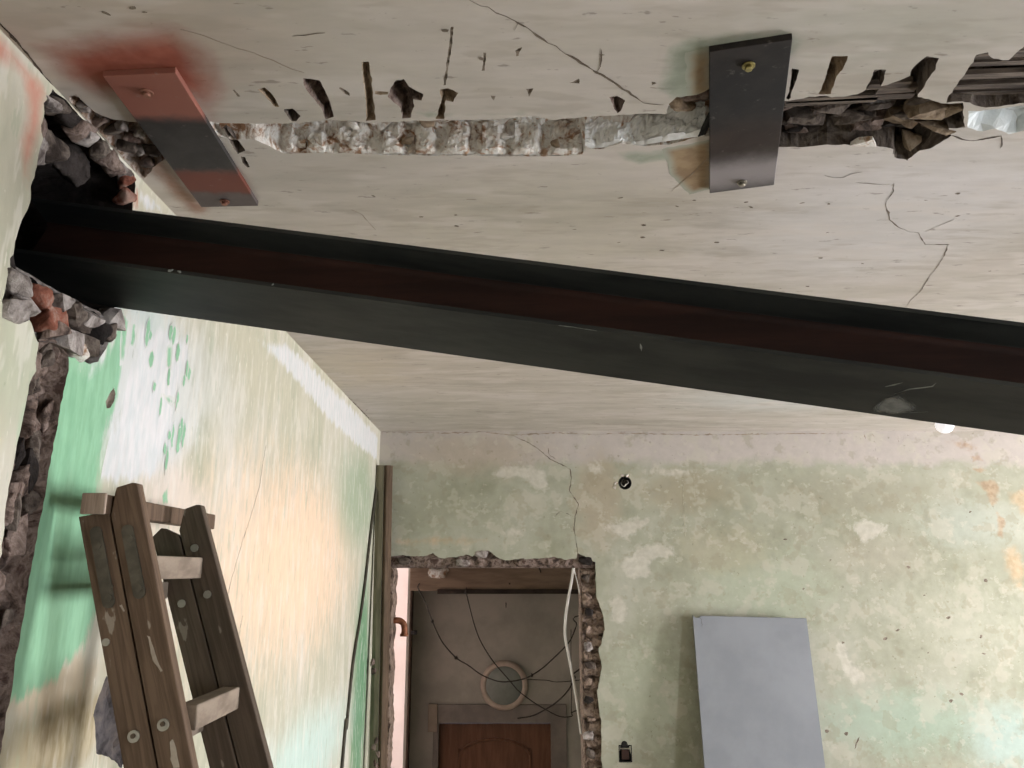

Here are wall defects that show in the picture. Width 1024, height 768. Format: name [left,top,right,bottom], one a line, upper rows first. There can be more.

flaking render [69,95,176,216]
spalling [223,124,249,167]
spalling [258,87,300,121]
spalling [303,78,334,119]
crack [470,0,659,105]
spalling [609,96,625,113]
spalling [779,47,1024,161]
crack [825,172,950,302]
peeling [2,267,194,768]
crack [345,394,874,554]
spalling [387,511,682,768]